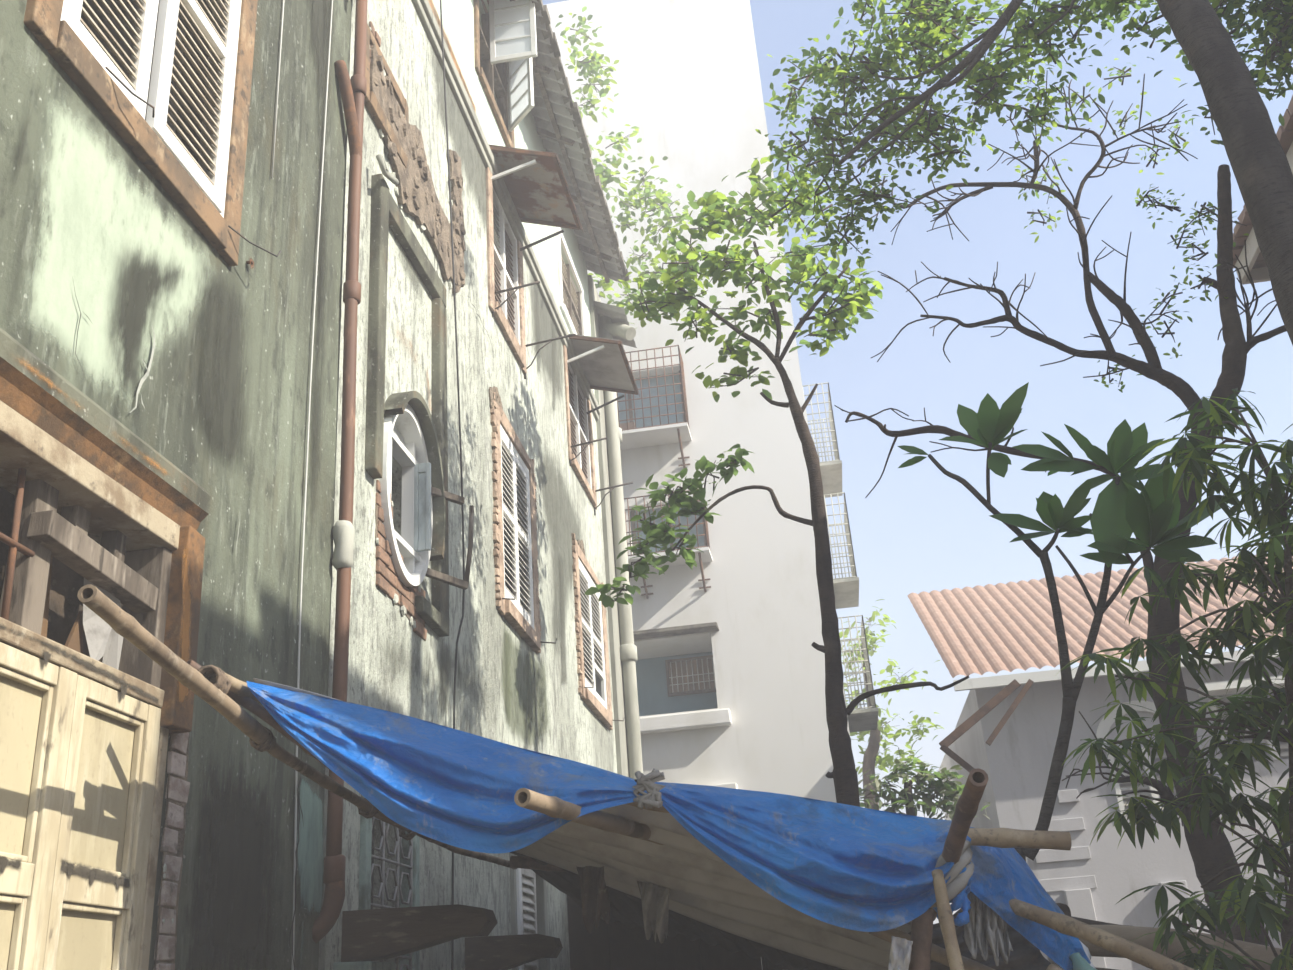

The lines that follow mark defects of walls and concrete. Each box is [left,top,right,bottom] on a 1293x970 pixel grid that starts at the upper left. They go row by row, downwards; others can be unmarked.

leakage [114,253,180,388]
leakage [201,282,245,458]
leakage [188,769,274,970]